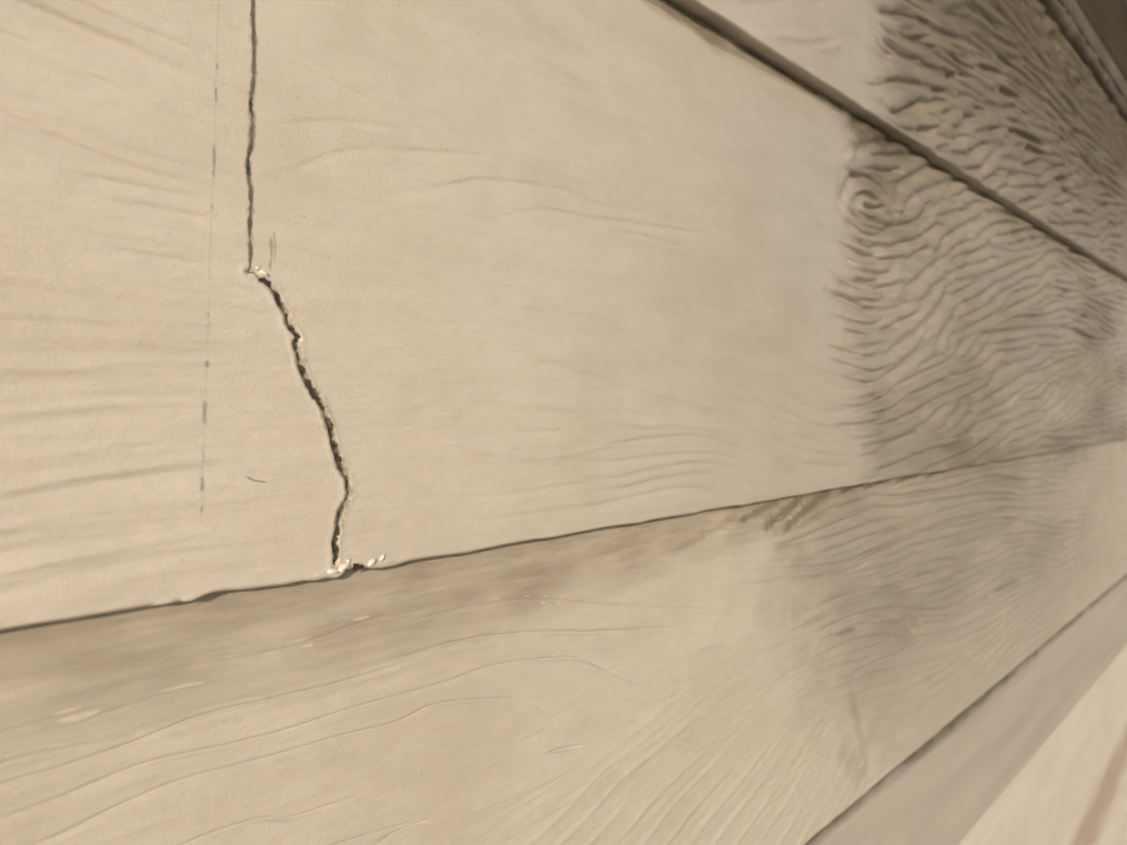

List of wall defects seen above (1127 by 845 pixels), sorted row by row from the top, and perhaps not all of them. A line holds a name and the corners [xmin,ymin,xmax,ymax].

crack [245,0,351,571]